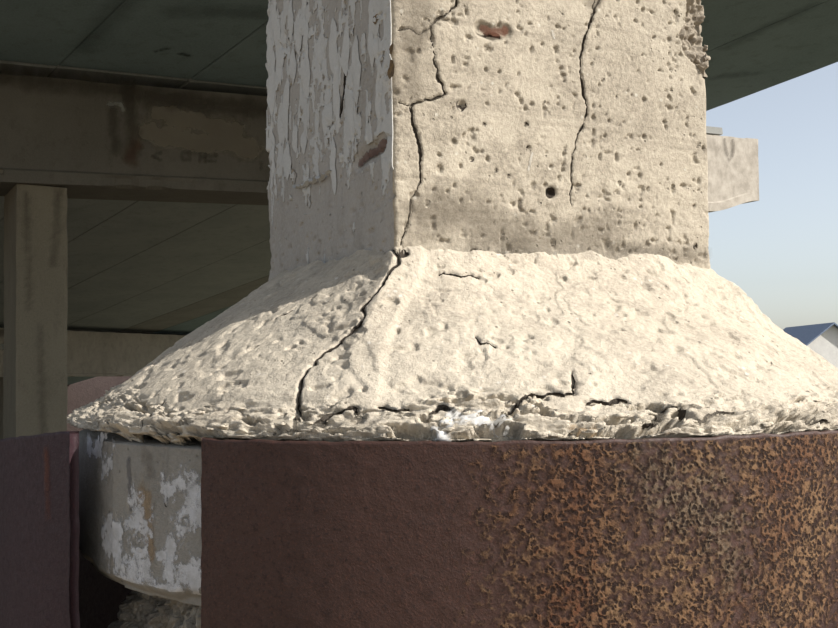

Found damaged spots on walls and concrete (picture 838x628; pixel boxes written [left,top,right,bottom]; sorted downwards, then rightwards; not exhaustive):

flaking render [265,0,395,281]
crack [278,0,467,433]
crack [439,272,479,280]
corrosion [480,25,508,39]
crack [569,0,600,205]
spalling [678,0,711,78]
peeling [87,432,115,481]
spalling [101,465,201,628]
corrosion [476,433,838,628]